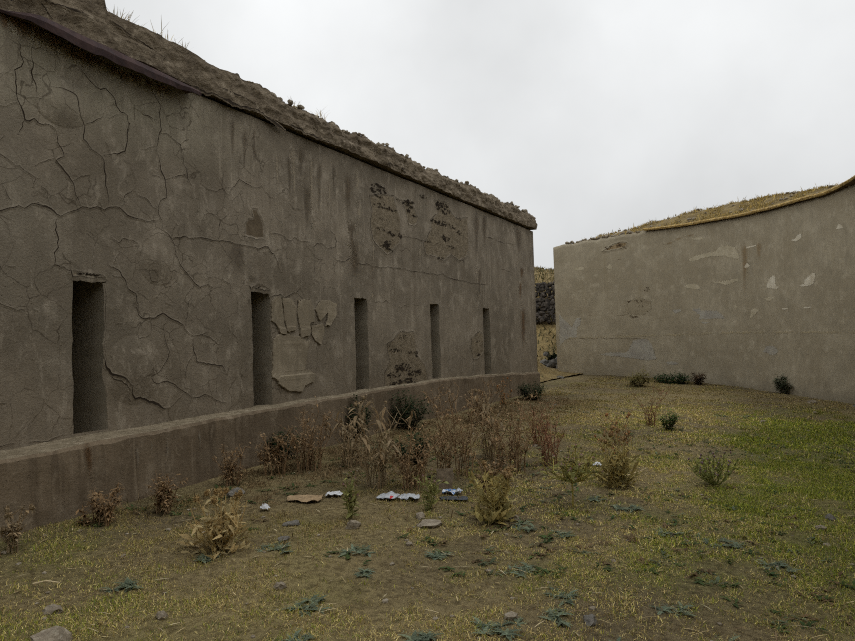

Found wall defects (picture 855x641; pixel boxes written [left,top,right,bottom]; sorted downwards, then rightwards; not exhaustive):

crack [0,0,511,412]
spalling [368,183,469,263]
peeling [250,280,337,394]
spalling [382,329,429,386]
crack [0,433,63,449]